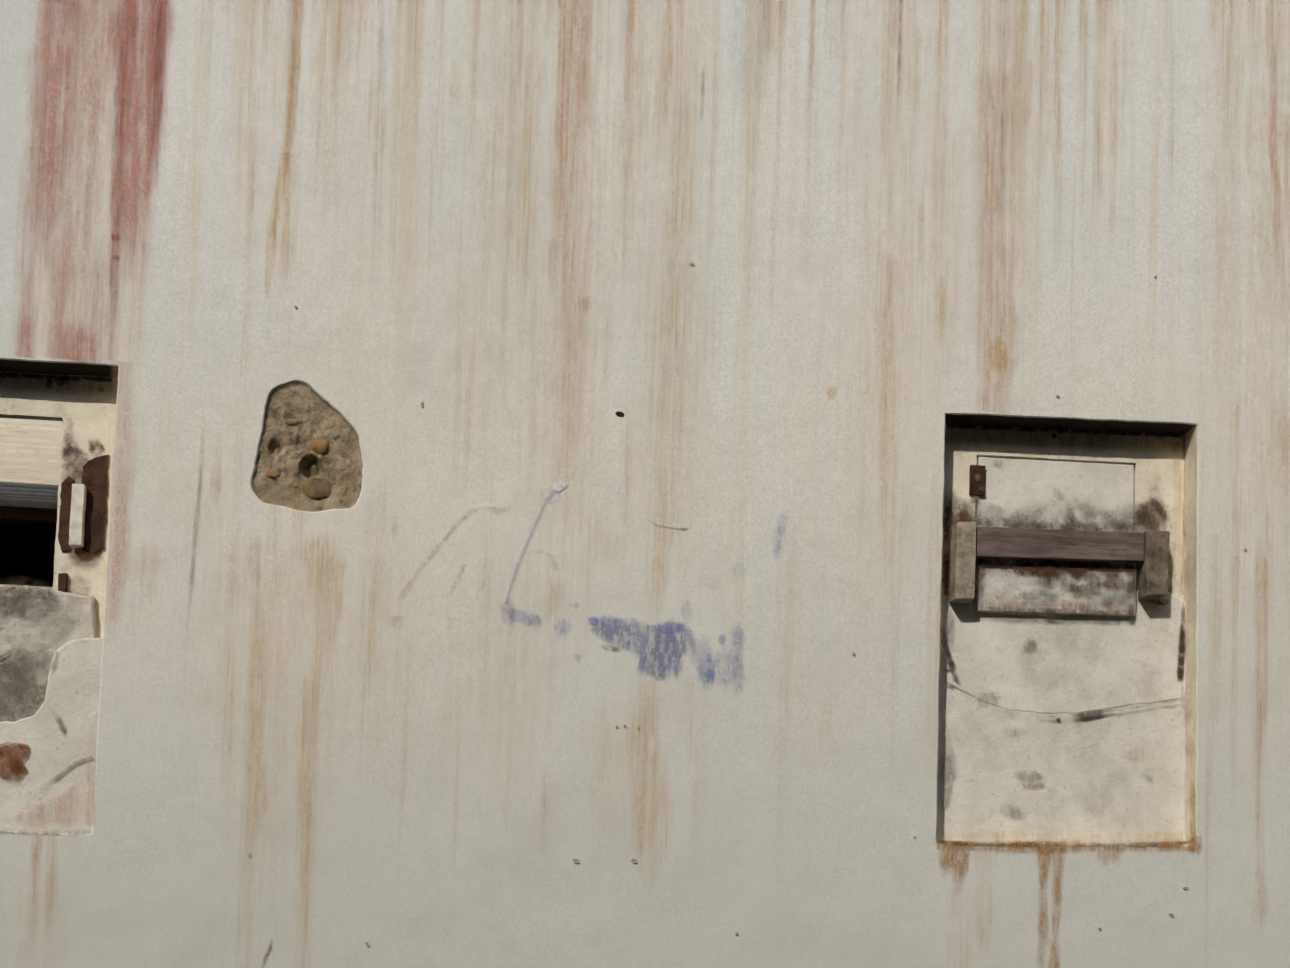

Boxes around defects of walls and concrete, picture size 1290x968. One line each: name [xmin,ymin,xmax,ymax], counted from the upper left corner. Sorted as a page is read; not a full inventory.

rust [37,0,166,284]
flaking render [252,381,363,512]
leakage [945,501,1154,533]
rust [0,743,29,779]
rust [1159,831,1200,850]
rust [943,841,1095,933]